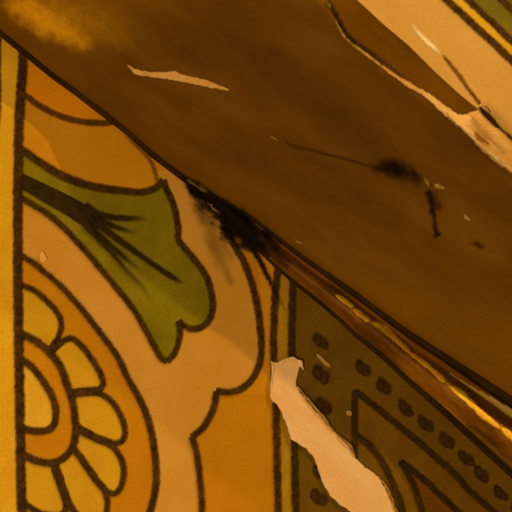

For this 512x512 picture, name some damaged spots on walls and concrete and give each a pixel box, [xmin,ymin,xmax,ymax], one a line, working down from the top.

crack [288,144,417,180]
spalling [446,110,512,173]
peeling [270,357,398,512]